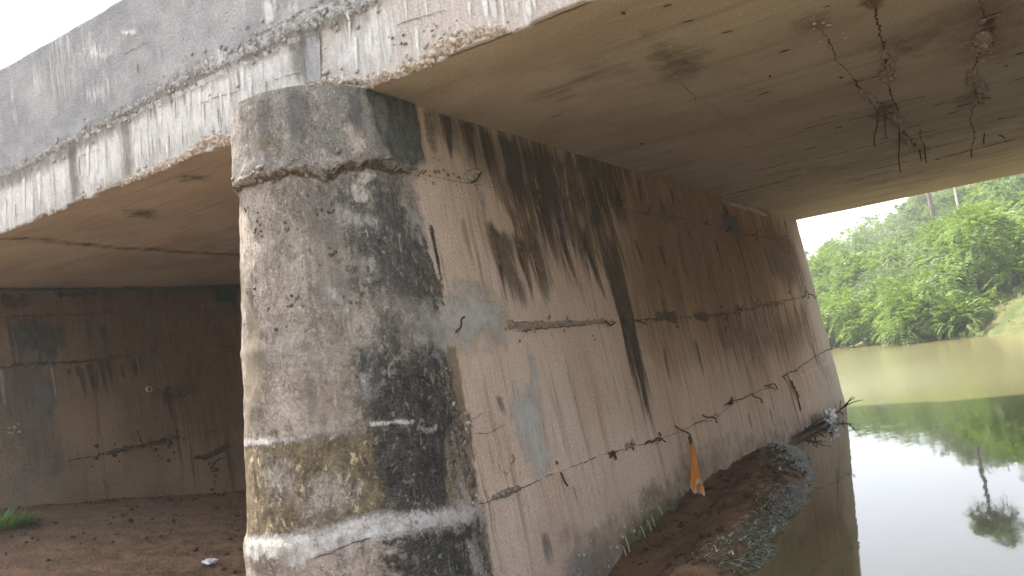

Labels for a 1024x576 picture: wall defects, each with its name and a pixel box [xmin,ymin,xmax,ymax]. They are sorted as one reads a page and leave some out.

spalling [0,0,383,187]
crack [657,0,1024,197]
spalling [81,129,231,198]
water stain [348,89,649,412]
crack [623,267,809,330]
water stain [369,419,448,489]
crack [477,386,771,505]